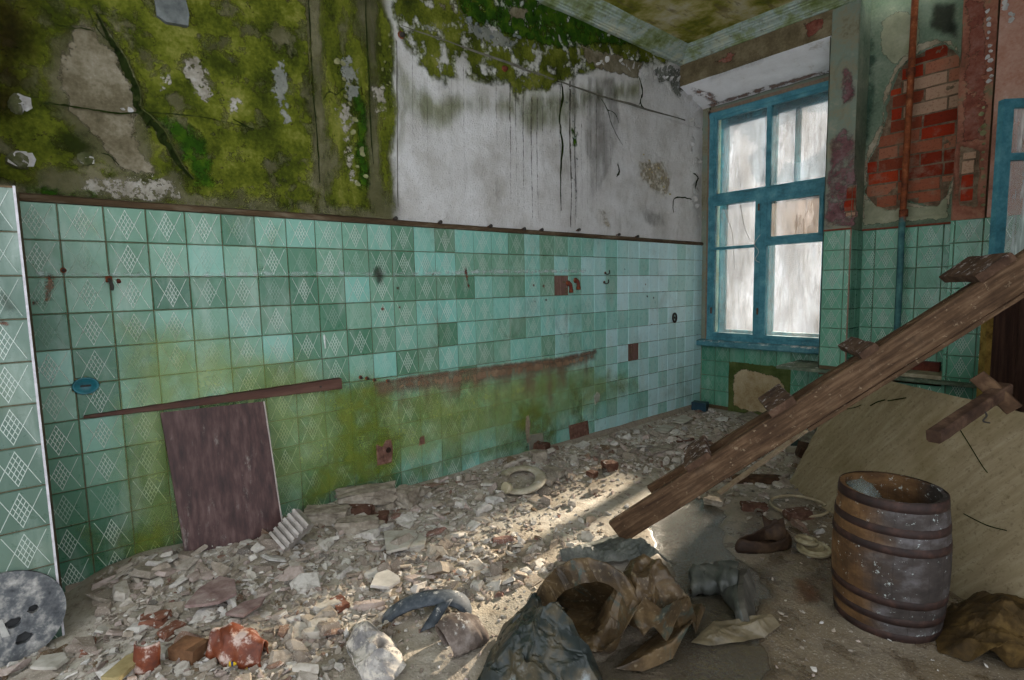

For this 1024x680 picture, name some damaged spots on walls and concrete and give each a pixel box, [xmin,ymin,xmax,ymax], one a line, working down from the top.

leakage [0,0,29,112]
leakage [59,132,91,154]
flaking render [57,22,182,201]
crack [43,8,254,180]
crack [308,0,685,210]
leakage [559,82,582,224]
flaking render [825,0,1015,226]
peeling [555,276,568,295]
rust [379,350,596,399]
peeling [628,343,638,361]
peeling [728,361,791,415]